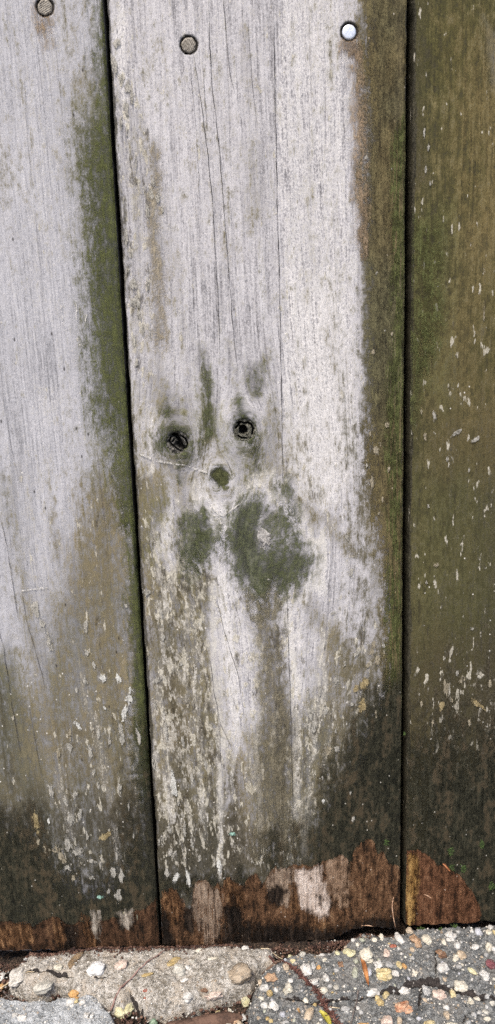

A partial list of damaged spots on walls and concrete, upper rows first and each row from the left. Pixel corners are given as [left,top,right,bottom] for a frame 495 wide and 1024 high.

damp [0,1,248,941]
damp [177,0,495,922]